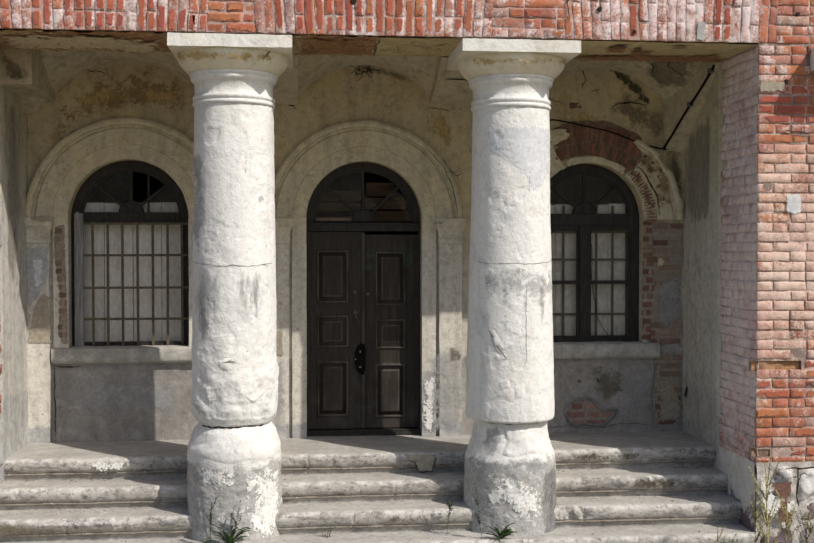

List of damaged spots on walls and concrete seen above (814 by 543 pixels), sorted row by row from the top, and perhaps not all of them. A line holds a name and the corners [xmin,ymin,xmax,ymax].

water stain [52,75,184,139]
water stain [193,157,205,245]
spalling [485,120,684,429]
flaking render [423,376,436,432]
peeling [197,467,234,490]
peeling [245,468,279,538]
peeling [488,476,541,520]
crack [785,466,814,506]